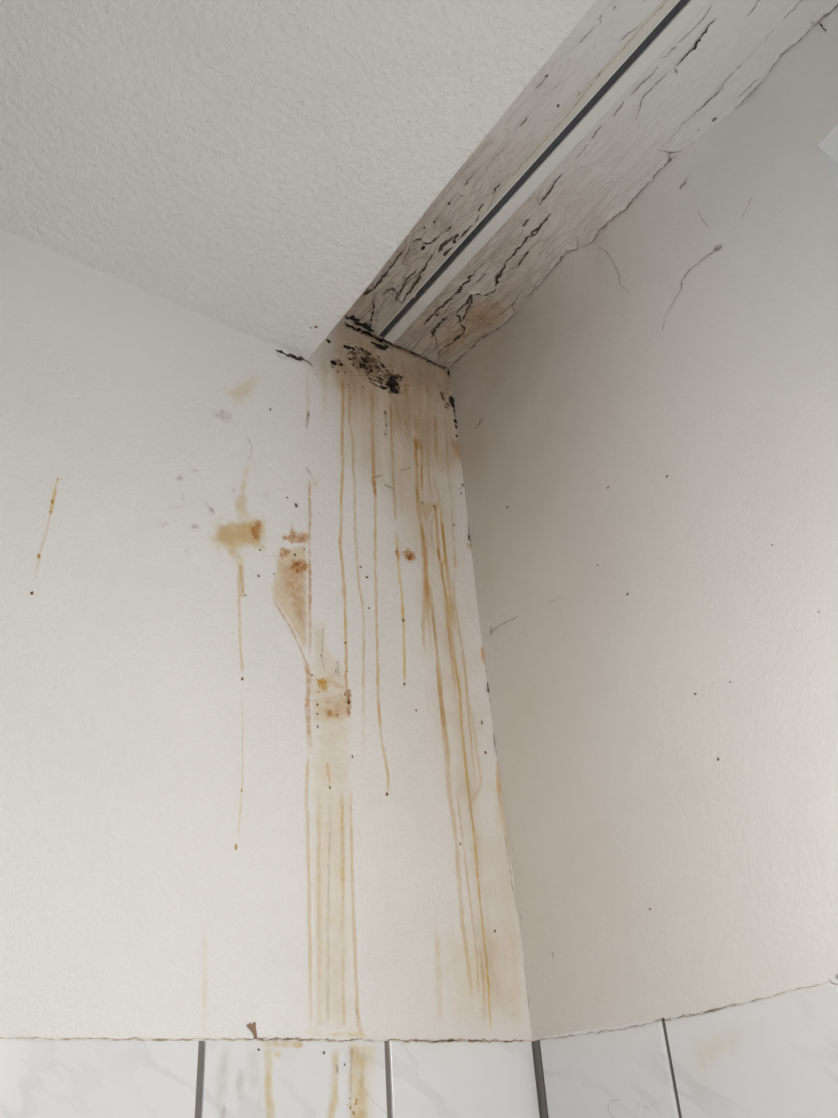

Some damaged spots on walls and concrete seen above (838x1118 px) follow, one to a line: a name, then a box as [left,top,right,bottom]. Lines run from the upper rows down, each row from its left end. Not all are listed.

damp [316,315,451,394]